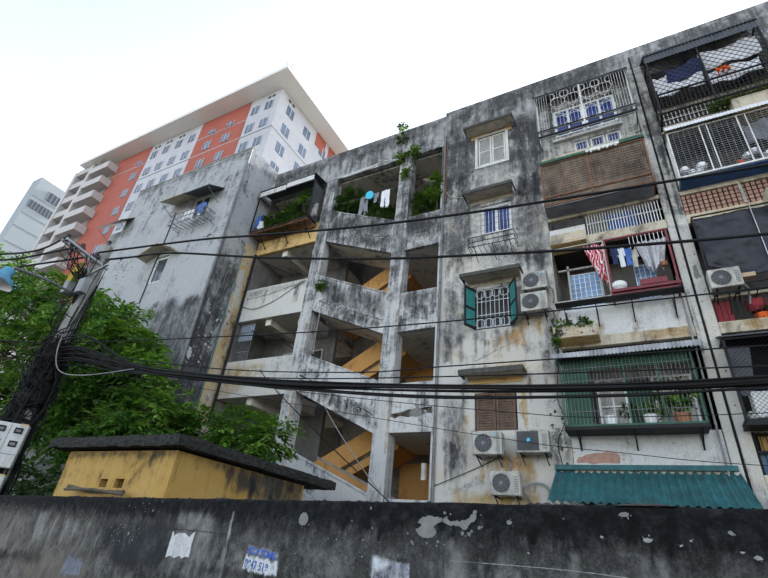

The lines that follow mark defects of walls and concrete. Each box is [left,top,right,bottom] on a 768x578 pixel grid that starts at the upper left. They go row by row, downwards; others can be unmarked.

water stain [150,297,201,369]
peeling [549,398,625,471]
water stain [102,524,166,578]
peeling [407,510,483,547]